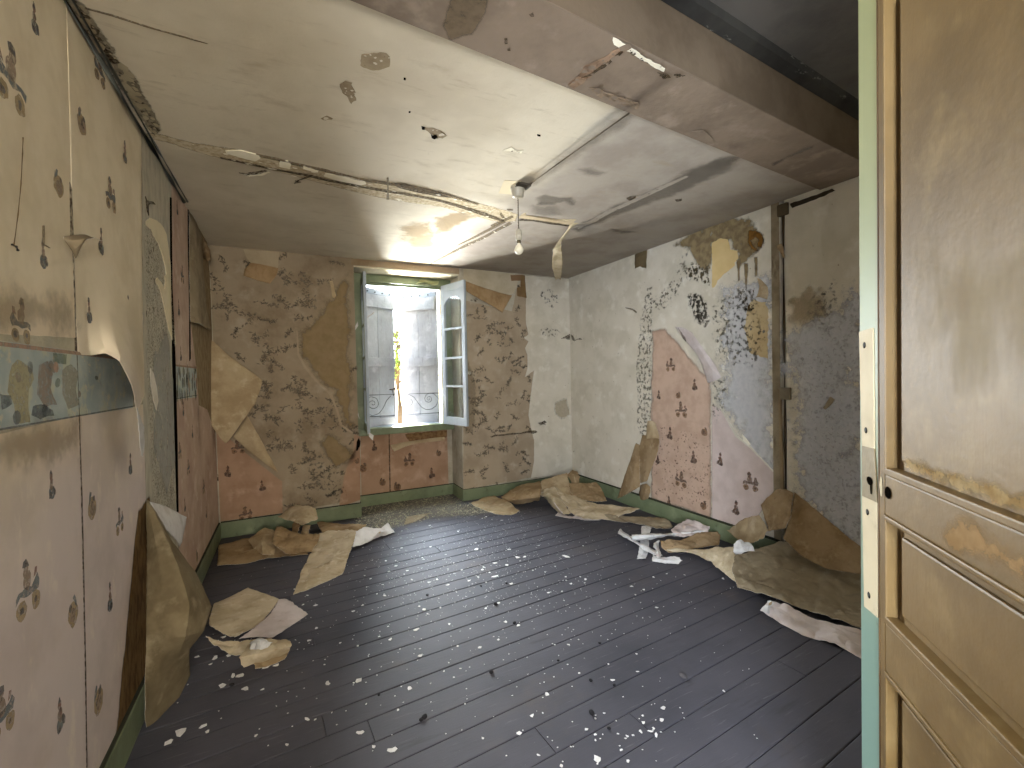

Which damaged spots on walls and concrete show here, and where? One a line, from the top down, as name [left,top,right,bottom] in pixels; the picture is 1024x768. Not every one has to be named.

flaking render [613,37,685,78]
crack [220,153,513,264]
peeling [635,250,647,268]
peeling [712,238,738,288]
peeling [744,278,769,359]
flaking render [63,0,575,732]
peeling [617,443,640,499]